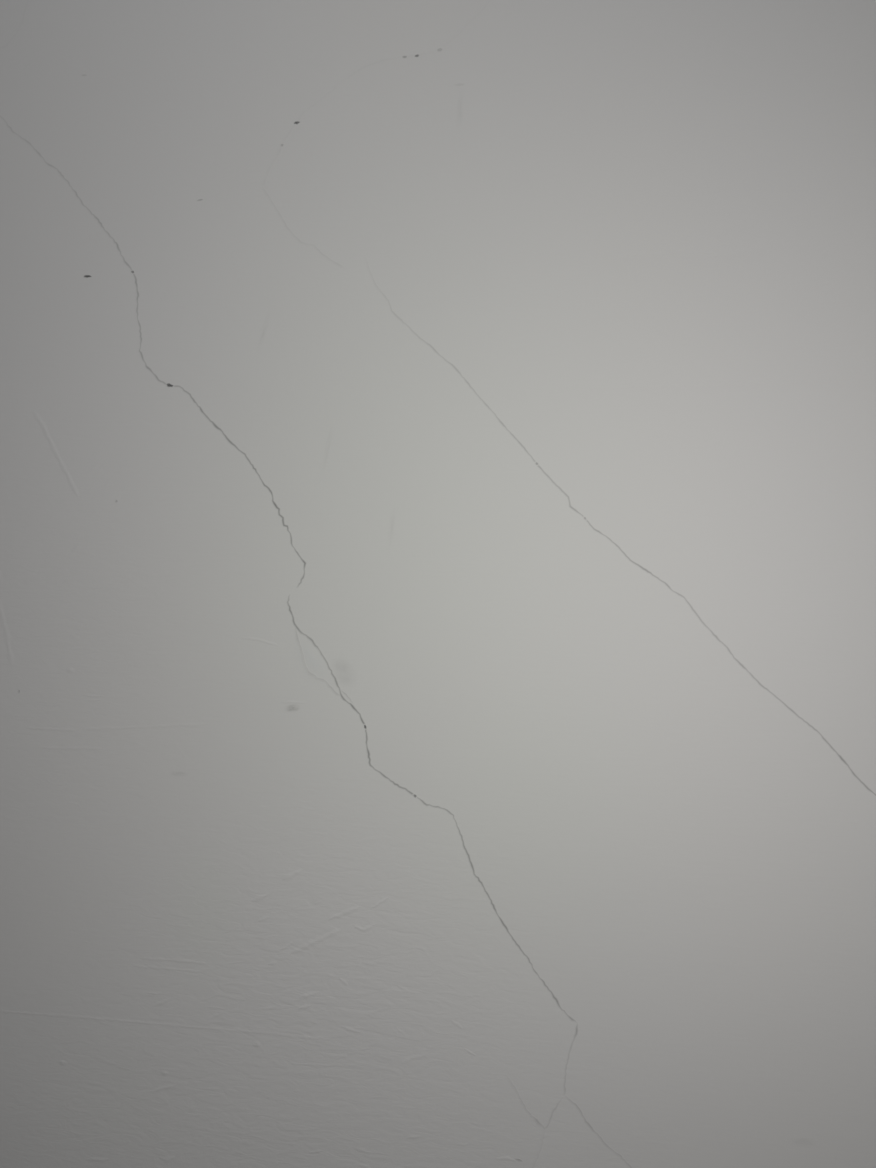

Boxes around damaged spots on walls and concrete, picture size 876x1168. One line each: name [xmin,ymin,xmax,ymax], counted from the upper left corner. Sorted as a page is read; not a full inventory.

crack [0,114,633,1168]
crack [262,187,876,796]